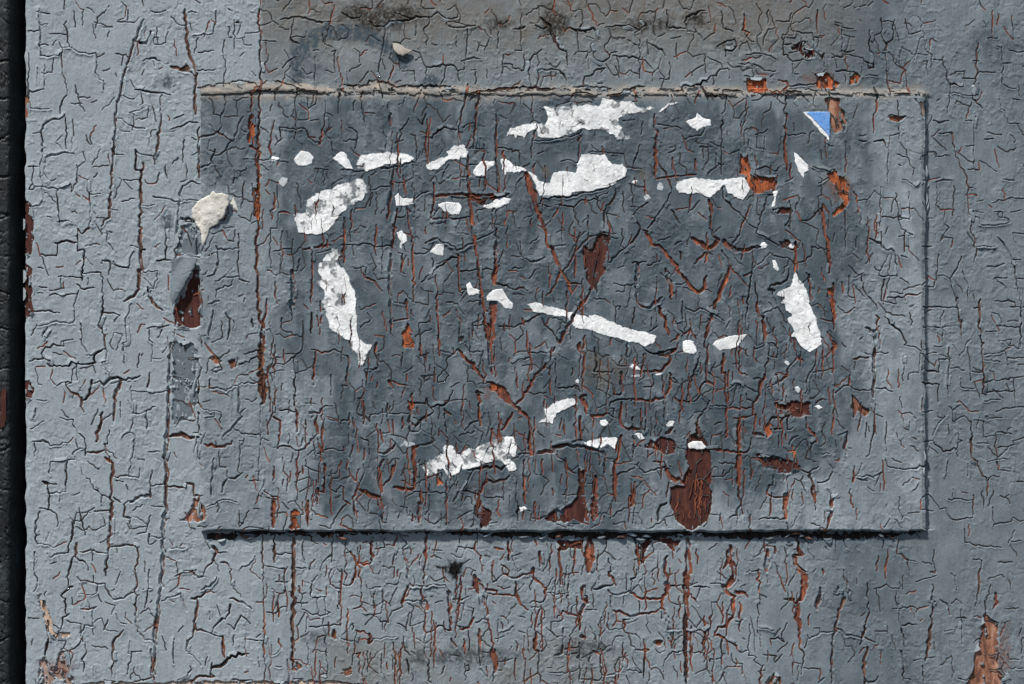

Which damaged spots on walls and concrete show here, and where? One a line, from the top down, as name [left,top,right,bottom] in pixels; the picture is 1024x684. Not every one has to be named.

crack [26,2,184,442]
peeling [170,191,238,425]
peeling [582,232,608,291]
peeling [739,153,778,194]
peeling [816,72,859,133]
crack [859,87,956,248]
crack [920,0,1024,258]
crack [923,257,1024,400]
crack [34,457,76,607]
peeling [644,422,713,530]
crack [896,397,1024,515]
peeling [967,614,1005,684]